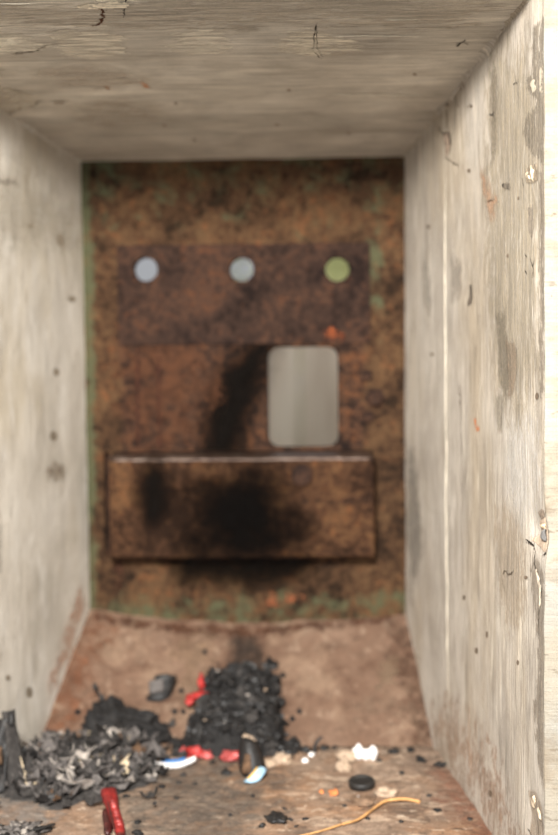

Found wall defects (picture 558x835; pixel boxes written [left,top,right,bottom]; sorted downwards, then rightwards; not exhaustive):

spalling [77,0,134,17]
peeling [524,509,548,783]